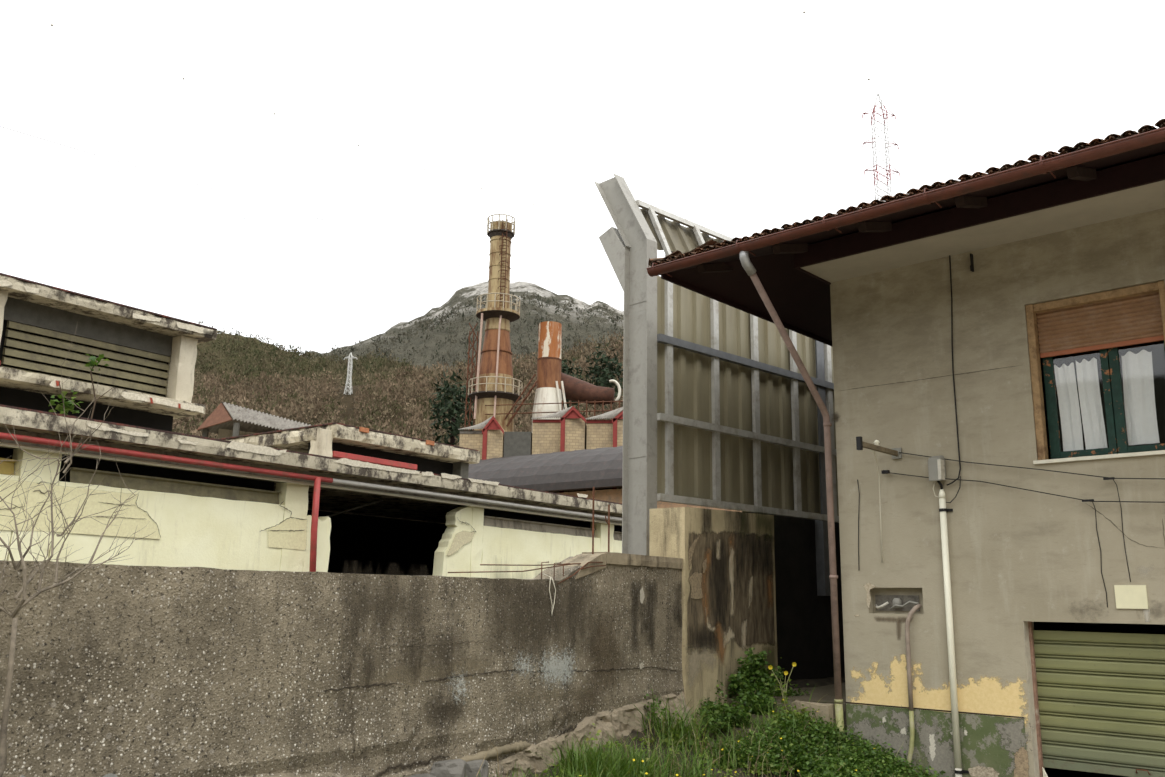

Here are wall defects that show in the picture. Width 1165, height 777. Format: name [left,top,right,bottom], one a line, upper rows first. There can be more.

water stain [632,584,656,643]
peeling [847,654,1032,777]